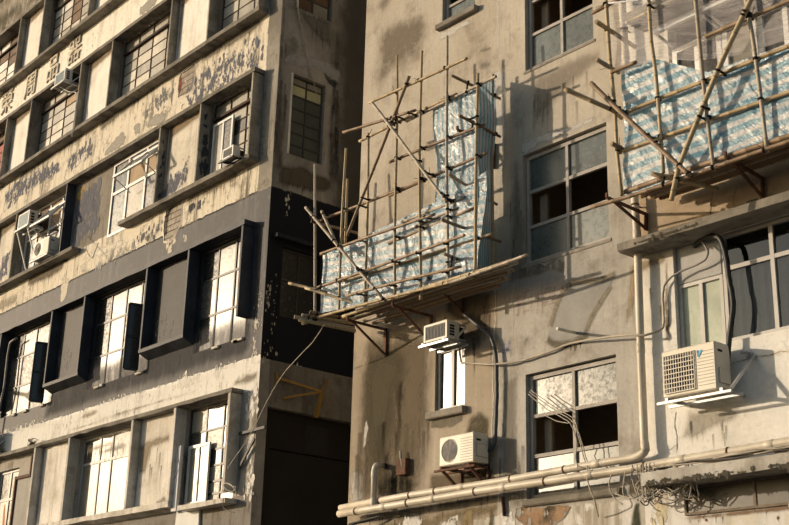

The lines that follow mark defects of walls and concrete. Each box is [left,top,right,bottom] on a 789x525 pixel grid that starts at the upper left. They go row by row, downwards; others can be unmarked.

peeling [145,36,263,120]
damp [381,21,422,77]
peeling [3,137,92,209]
peeling [157,140,190,199]
flaking render [95,200,205,271]
crack [730,349,789,366]
damp [352,340,494,502]
damp [431,381,519,488]
peeling [399,514,425,525]
damp [503,489,522,511]
spalling [502,504,571,525]
spalling [644,465,755,488]